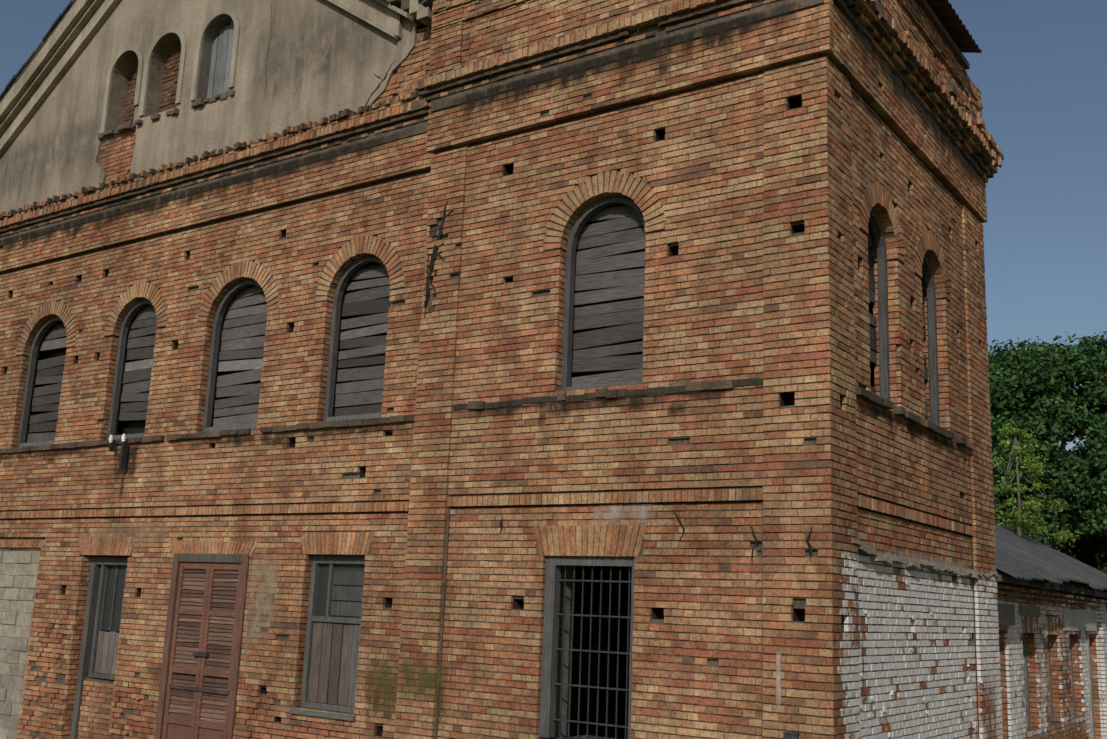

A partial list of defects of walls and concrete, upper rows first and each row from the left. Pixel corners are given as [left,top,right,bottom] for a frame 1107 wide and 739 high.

crack [423,200,453,306]
peeling [892,563,910,589]
peeling [848,585,870,648]
peeling [859,673,901,737]
peeling [963,659,987,739]